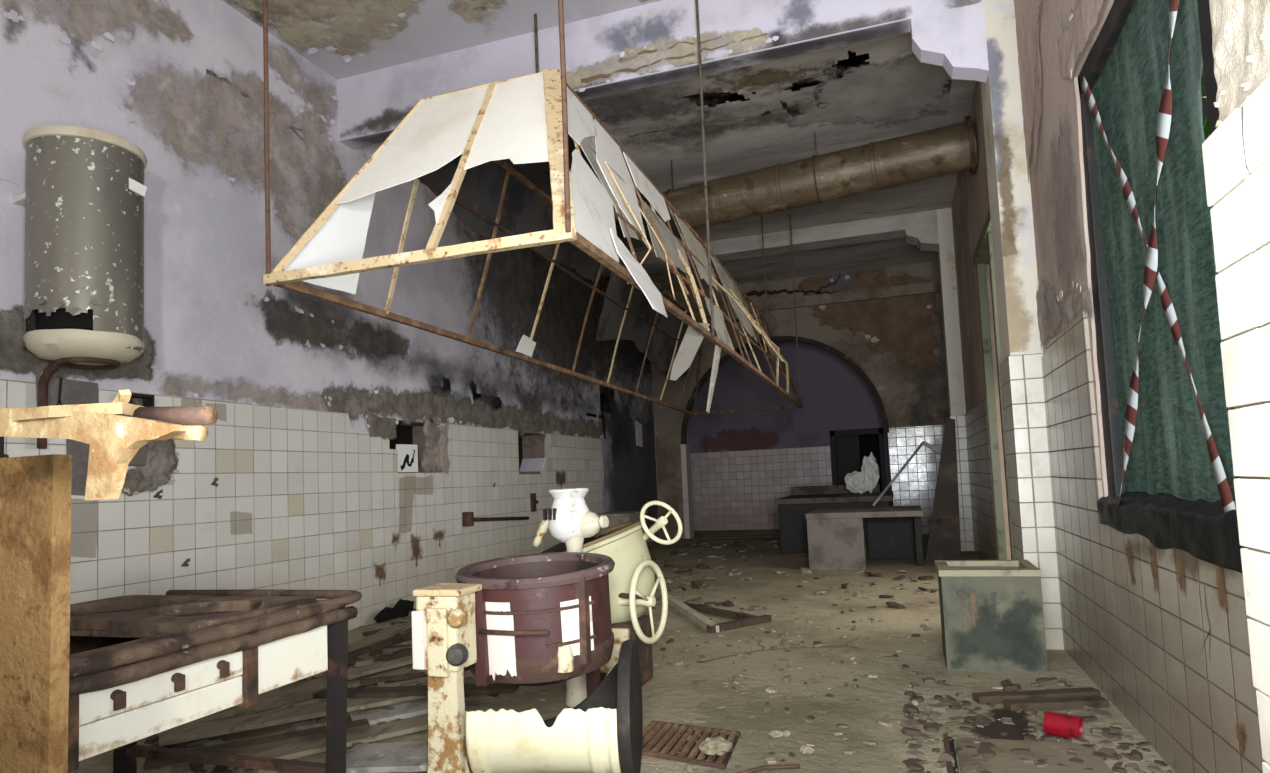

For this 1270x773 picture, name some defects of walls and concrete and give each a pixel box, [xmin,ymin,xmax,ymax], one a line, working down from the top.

peeling [3,0,192,68]
spalling [125,0,421,243]
spalling [566,28,779,92]
peeling [789,54,952,128]
damp [987,40,1017,256]
spalling [0,305,155,407]
spalling [259,282,410,362]
peeling [163,371,602,474]
peeling [66,439,90,496]
spalling [122,439,179,499]